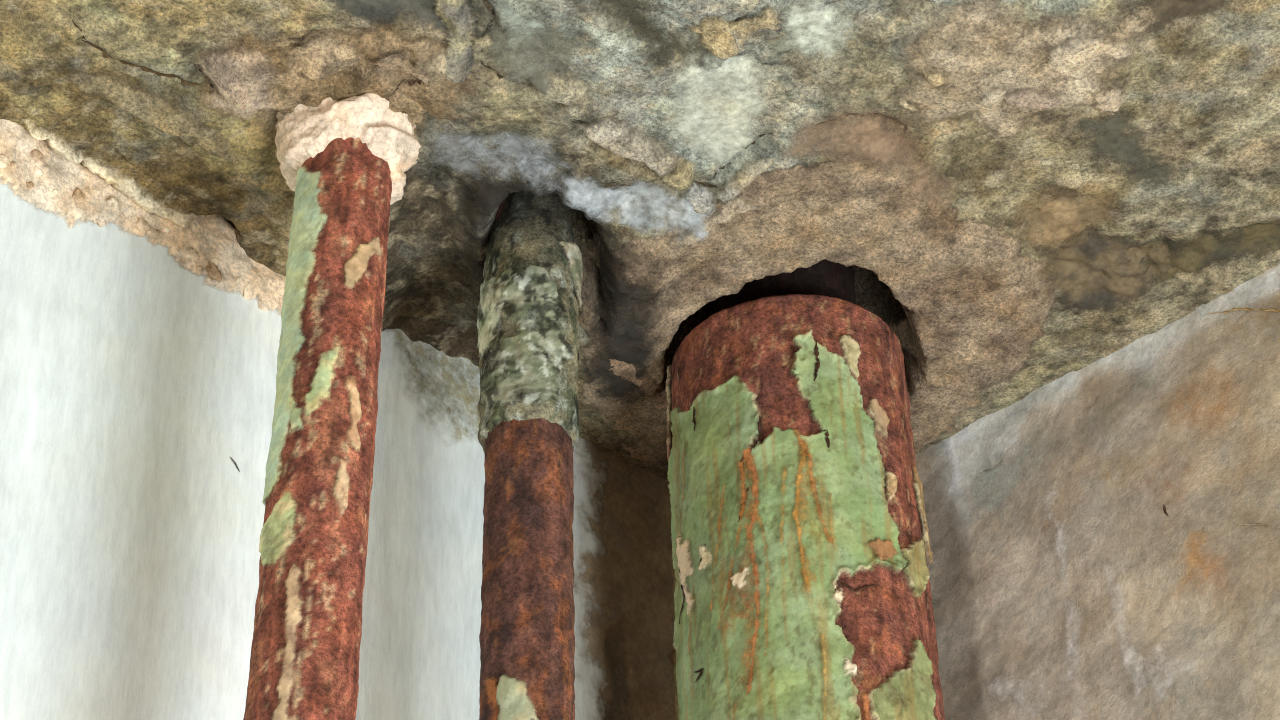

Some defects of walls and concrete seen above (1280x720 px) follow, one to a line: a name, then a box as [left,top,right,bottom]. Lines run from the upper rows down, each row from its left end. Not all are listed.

crack [72,19,219,94]
peeling [692,9,780,59]
peeling [899,0,1151,137]
peeling [67,73,240,166]
water stain [1075,113,1174,185]
spalling [0,119,286,312]
water stain [438,133,706,402]
spalling [477,27,1173,597]
crack [1209,308,1280,342]
peeling [676,534,712,613]